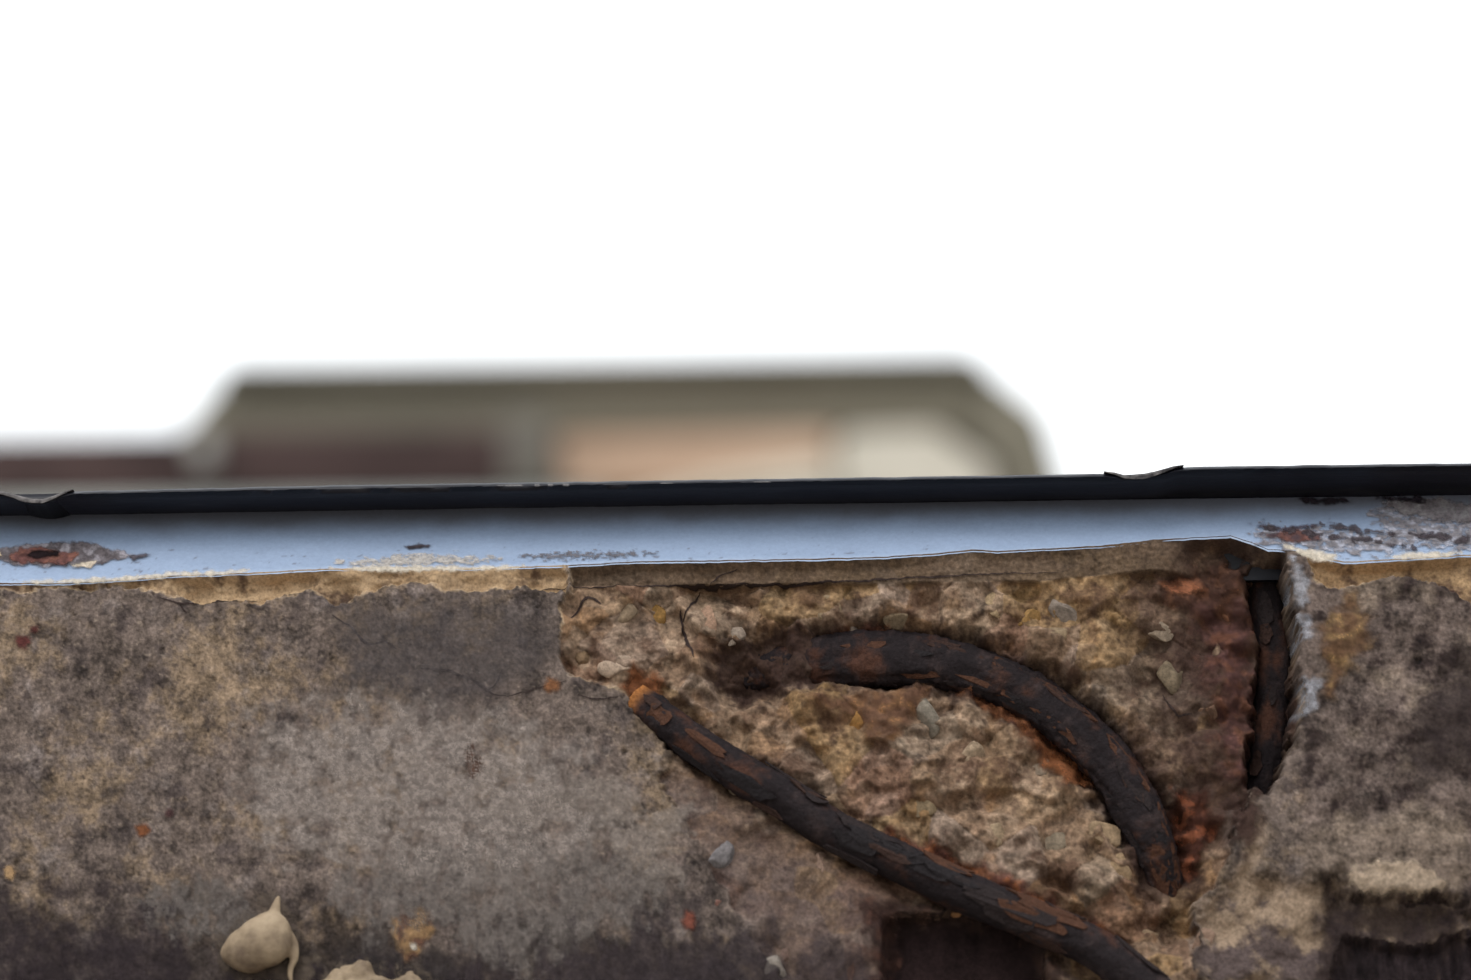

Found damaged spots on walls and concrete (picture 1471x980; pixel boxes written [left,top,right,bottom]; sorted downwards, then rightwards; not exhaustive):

corrosion [9,546,78,565]
corrosion [620,662,777,802]
spalling [0,494,1471,980]
corrosion [809,565,1274,897]
corrosion [765,761,1168,980]